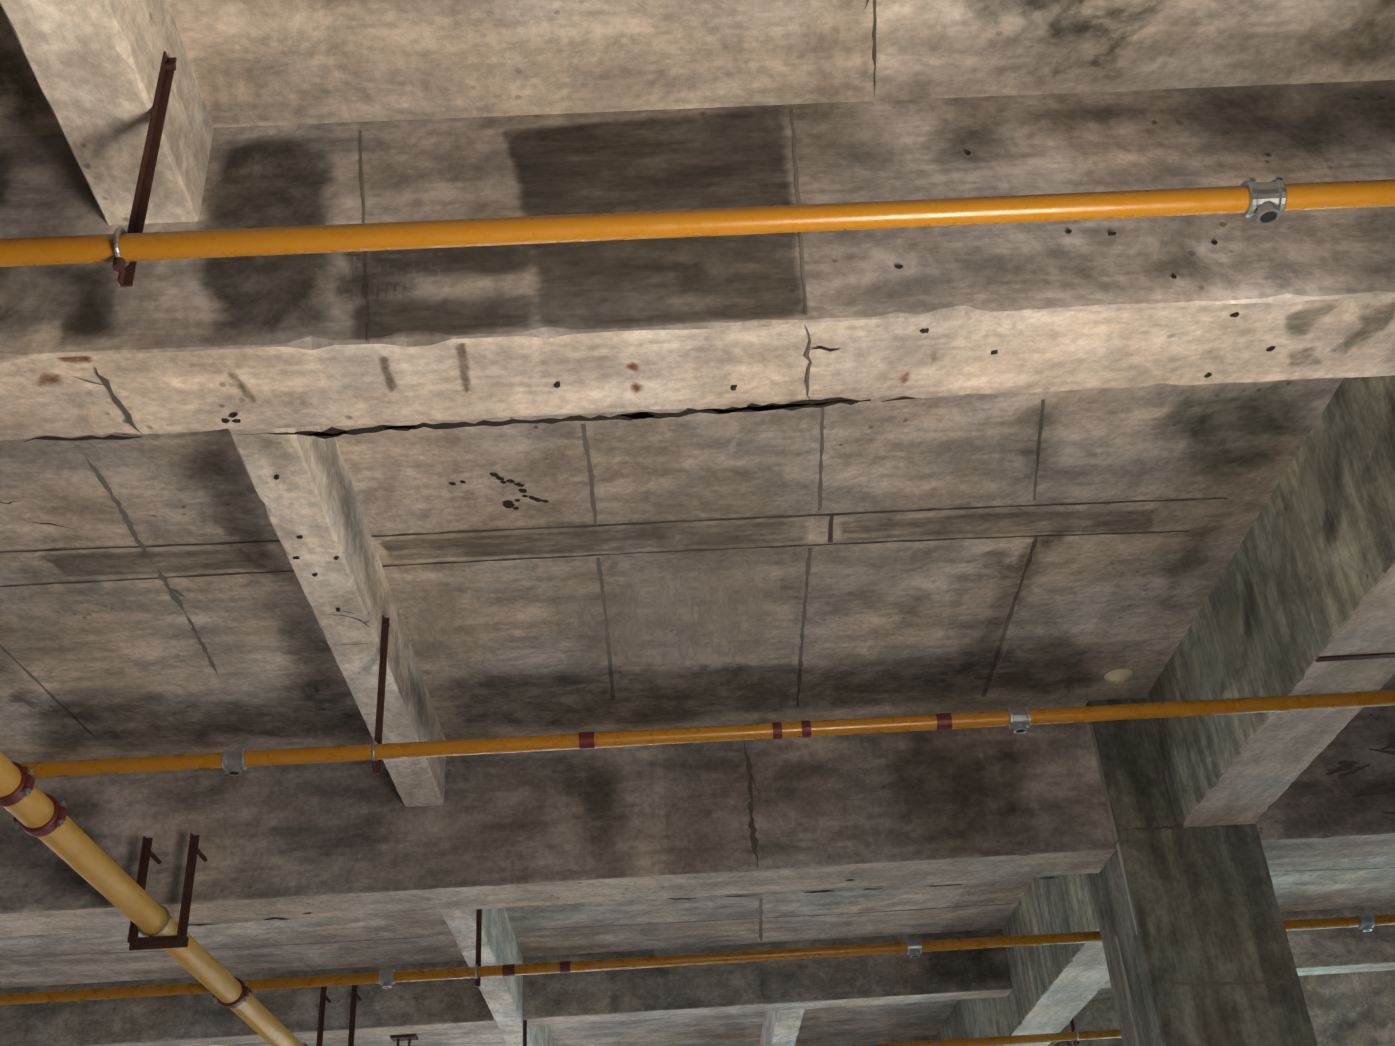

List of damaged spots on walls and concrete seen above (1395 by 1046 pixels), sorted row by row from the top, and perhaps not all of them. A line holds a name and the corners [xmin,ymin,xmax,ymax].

crack [24,368,219,678]
crack [245,325,916,439]